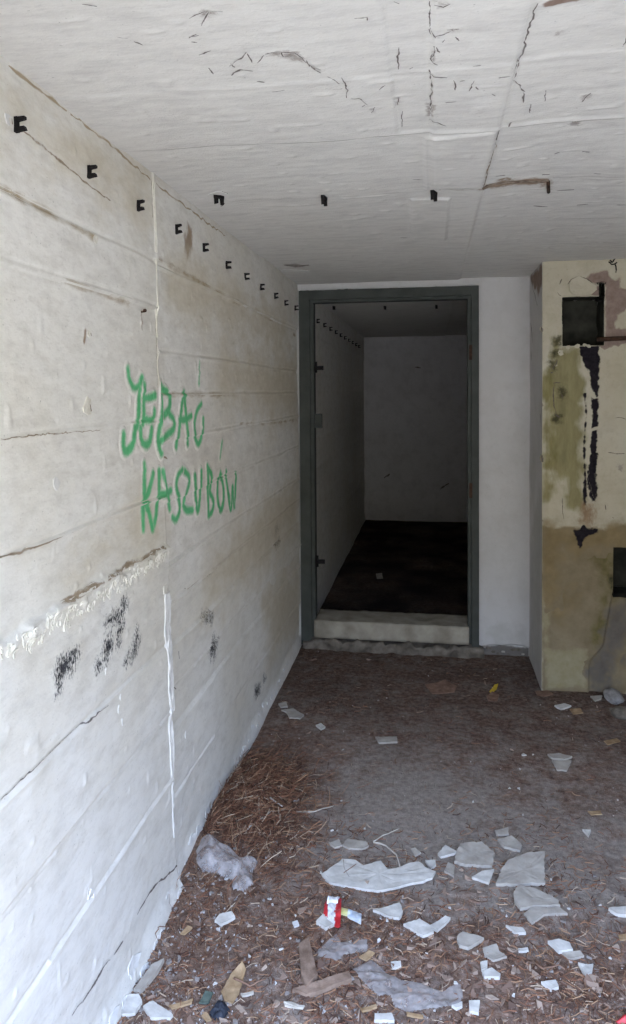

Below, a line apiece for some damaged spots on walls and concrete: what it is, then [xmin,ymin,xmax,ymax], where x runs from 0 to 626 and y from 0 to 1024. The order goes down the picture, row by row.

crack [186,0,570,190]
crack [566,91,596,127]
flaking render [556,269,626,366]
damp [0,56,302,709]
damp [479,324,626,694]
spalling [0,550,167,660]
crack [137,864,177,915]
crack [72,941,123,1016]